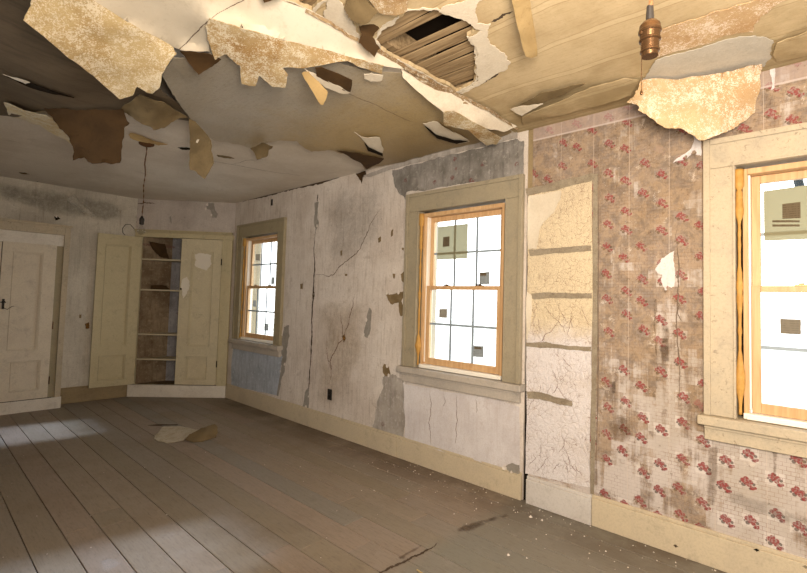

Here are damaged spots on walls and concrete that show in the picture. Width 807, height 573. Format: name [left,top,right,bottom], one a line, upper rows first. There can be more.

flaking render [282,0,360,37]
spalling [375,0,511,94]
flaking render [643,35,774,80]
peeling [277,325,290,396]
crack [308,212,378,388]
peeling [363,308,372,338]
peeling [386,272,404,316]
crack [525,173,600,494]
flaking render [403,381,520,473]